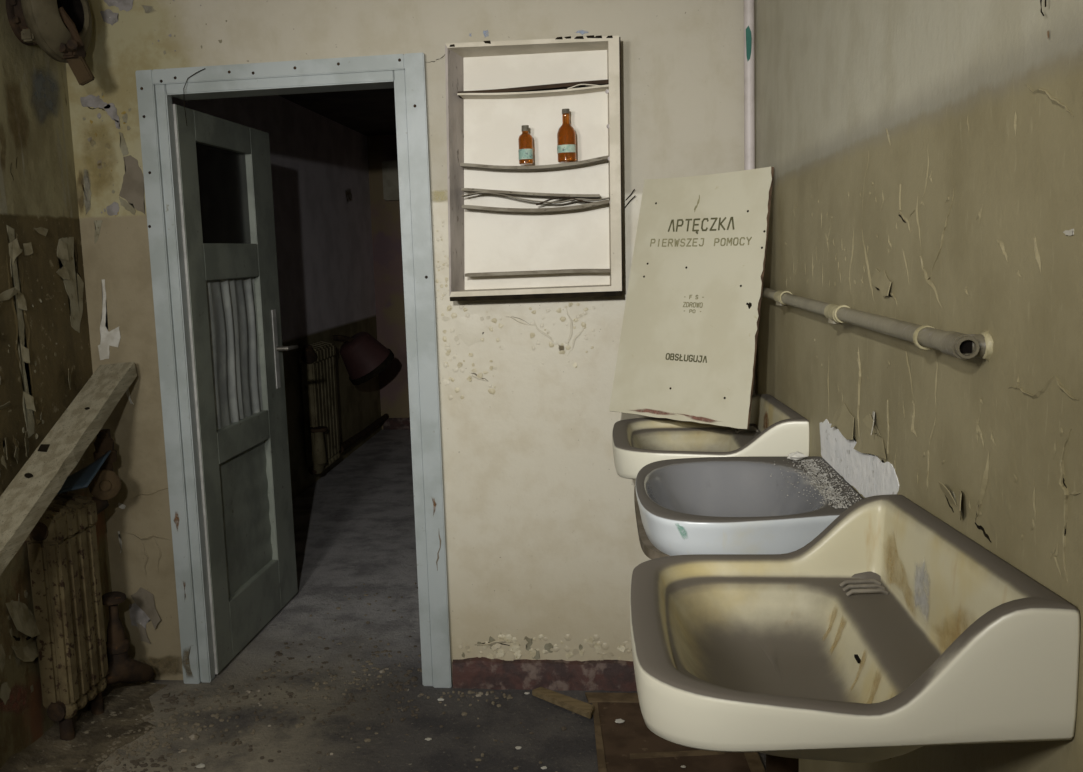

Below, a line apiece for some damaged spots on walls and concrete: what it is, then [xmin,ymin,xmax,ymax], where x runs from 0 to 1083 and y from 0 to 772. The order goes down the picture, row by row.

flaking render [80,93,145,216]
peeling [0,225,57,496]
flaking render [56,237,84,333]
peeling [98,279,121,360]
flaking render [819,403,899,498]
peeling [477,636,553,661]